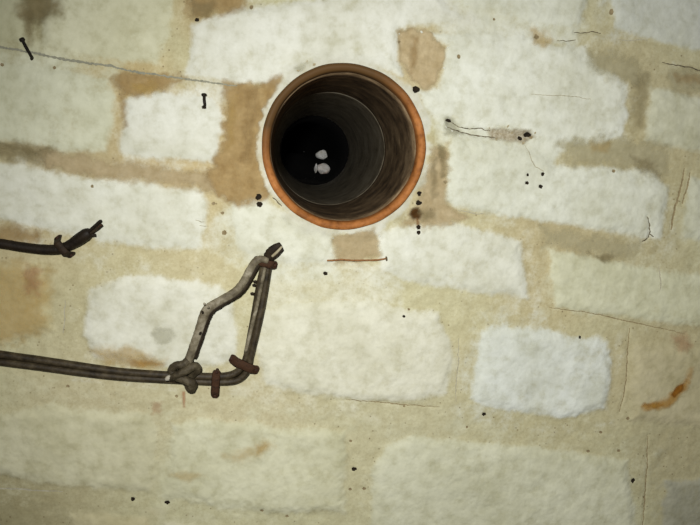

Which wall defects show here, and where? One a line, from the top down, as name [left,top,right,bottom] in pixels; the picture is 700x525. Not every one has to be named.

crack [448,122,495,138]
crack [550,307,684,411]
rust [643,383,686,410]